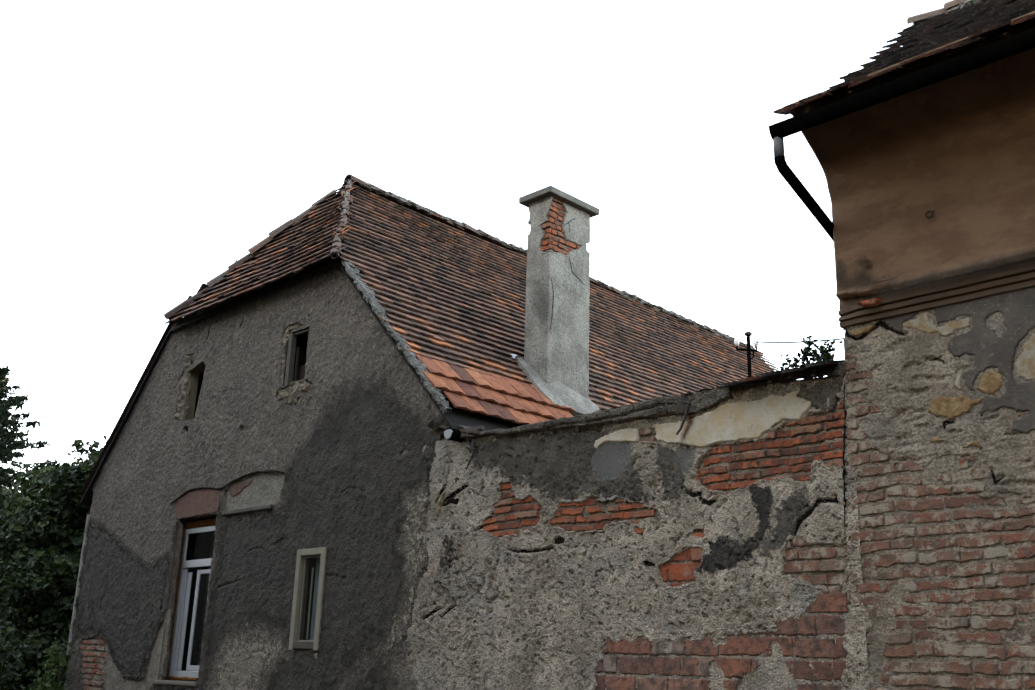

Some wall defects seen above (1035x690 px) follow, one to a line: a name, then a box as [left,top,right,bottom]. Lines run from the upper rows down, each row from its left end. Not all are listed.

spalling [538,198,582,257]
spalling [174,355,194,421]
spalling [276,323,313,405]
spalling [481,480,663,539]
spalling [594,286,1035,690]
spalling [79,520,183,690]
flaking render [204,616,296,690]